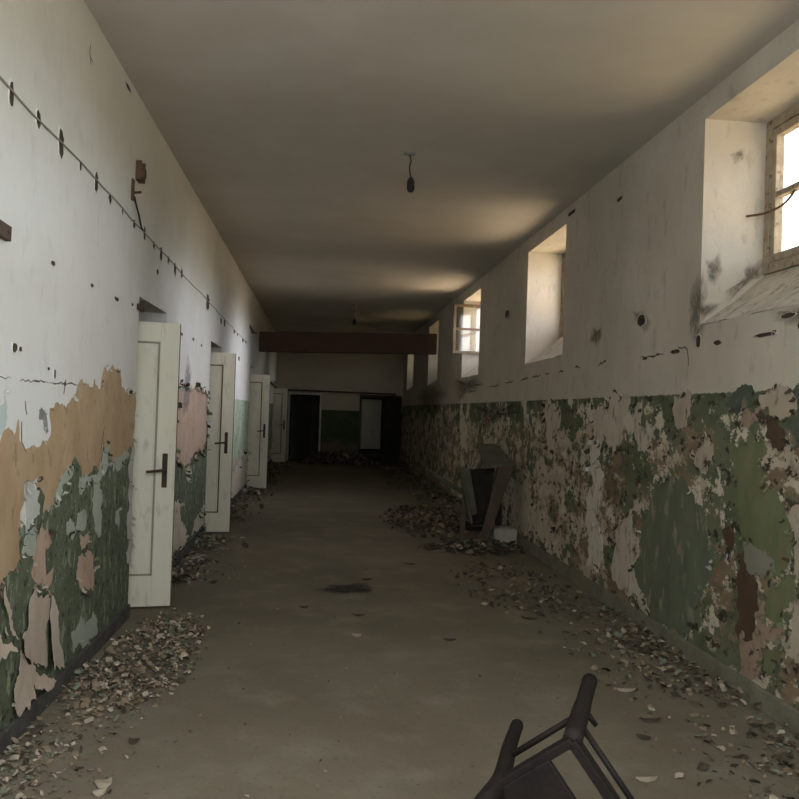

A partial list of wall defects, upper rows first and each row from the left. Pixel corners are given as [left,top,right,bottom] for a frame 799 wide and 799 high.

crack [0,376,77,391]
flaking render [176,379,212,483]
flaking render [540,399,561,461]
flaking render [231,448,252,502]
flaking render [0,365,138,717]
flaking render [173,499,207,561]
peeling [583,382,799,680]